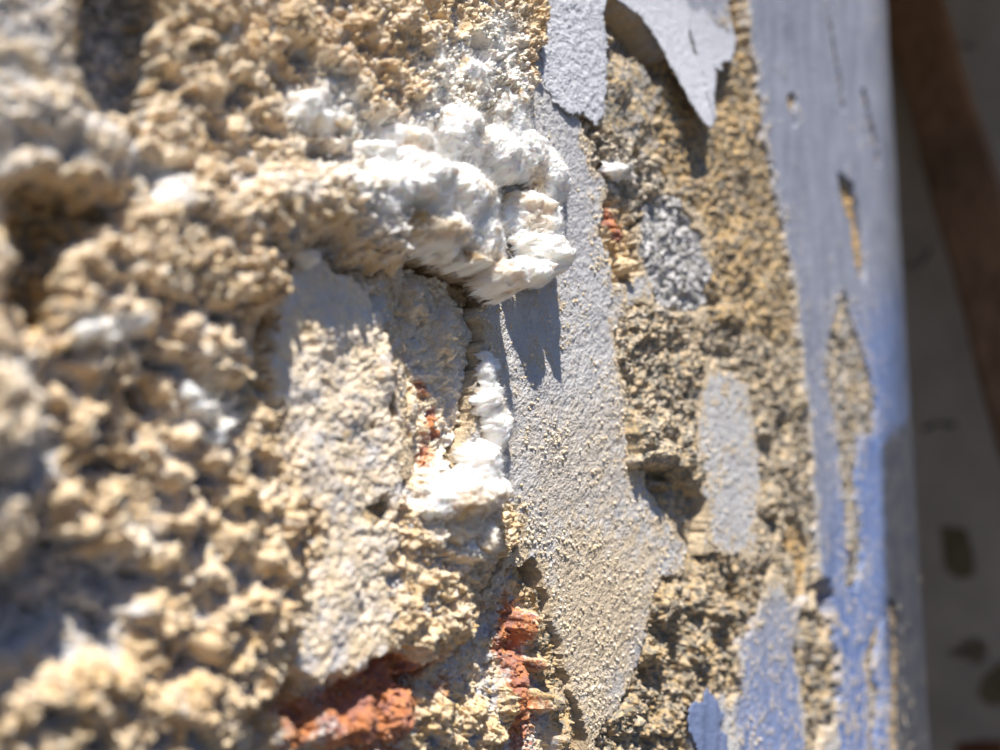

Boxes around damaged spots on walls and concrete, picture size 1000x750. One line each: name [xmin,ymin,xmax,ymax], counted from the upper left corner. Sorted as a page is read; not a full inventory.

leakage [280,46,584,313]
leakage [411,346,522,559]
spalling [540,0,837,750]
peeling [824,294,876,588]
flaking render [244,494,570,750]
peeling [865,623,879,750]
peeling [889,603,900,750]